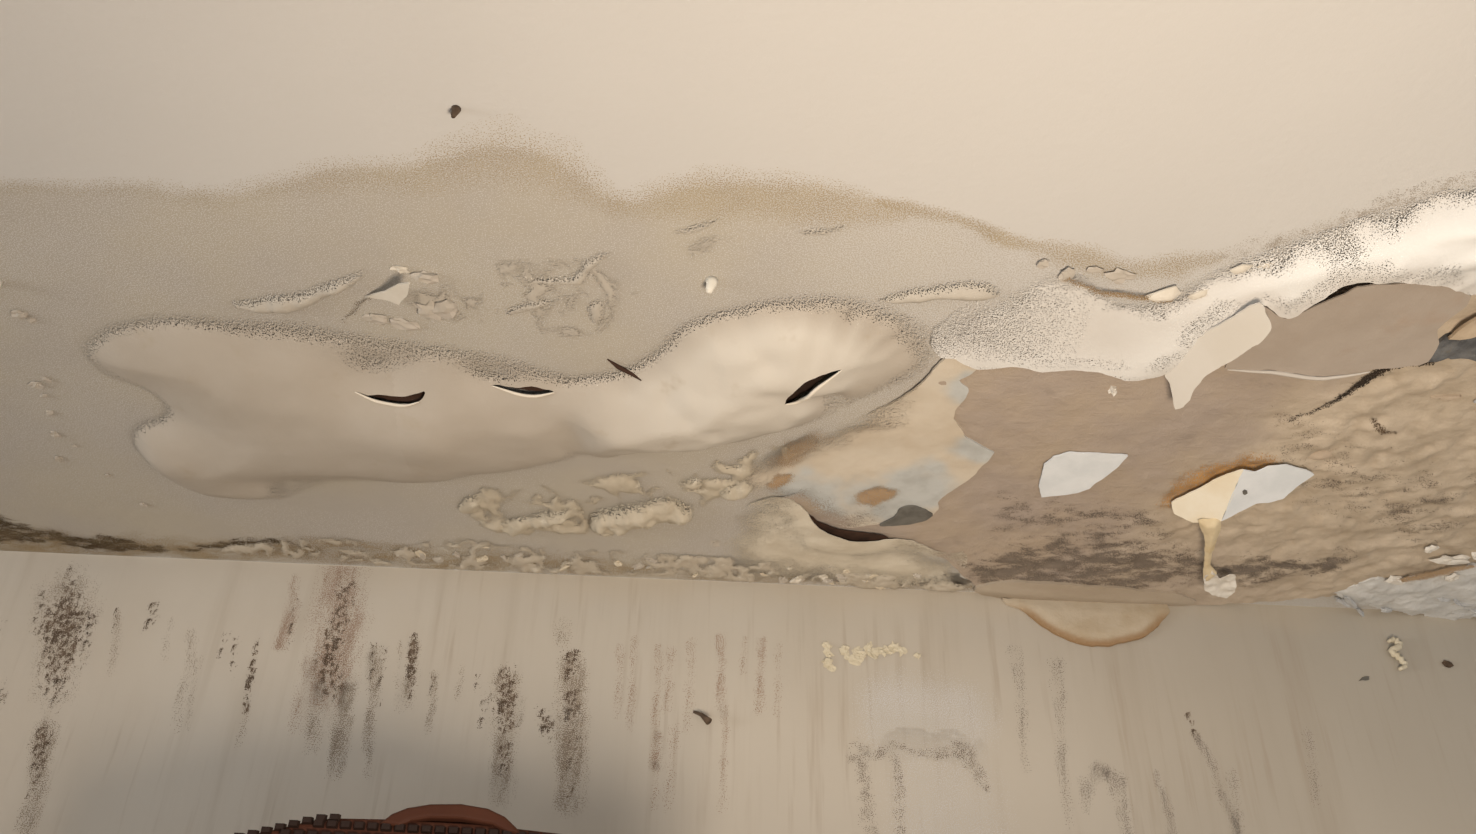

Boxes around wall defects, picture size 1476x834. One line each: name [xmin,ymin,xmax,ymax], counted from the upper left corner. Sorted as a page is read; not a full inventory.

damp [0,114,1476,781]
flaking render [218,187,1476,647]
damp [14,561,103,834]
damp [454,619,593,819]
damp [1184,711,1245,834]